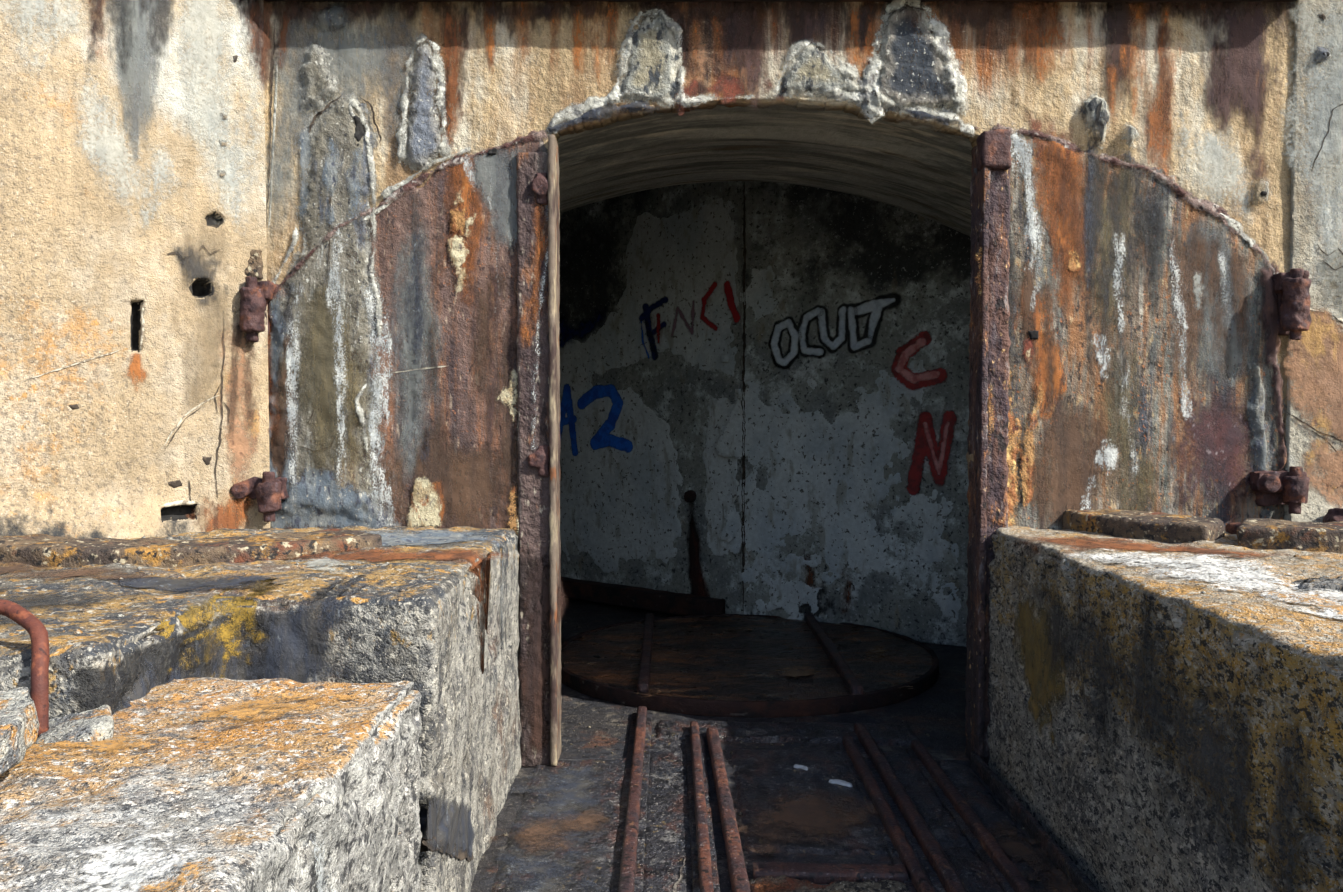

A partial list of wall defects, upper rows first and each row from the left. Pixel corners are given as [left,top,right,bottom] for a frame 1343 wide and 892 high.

water stain [83,0,245,223]
rust [238,0,381,84]
rust [436,1,618,144]
rust [634,1,1289,182]
crack [1312,104,1343,170]
peeling [448,188,476,293]
peeling [407,477,445,527]
rust [376,153,548,533]
rust [1021,119,1106,525]
rust [1177,397,1252,523]
rust [1259,261,1287,471]
crack [1284,410,1343,453]